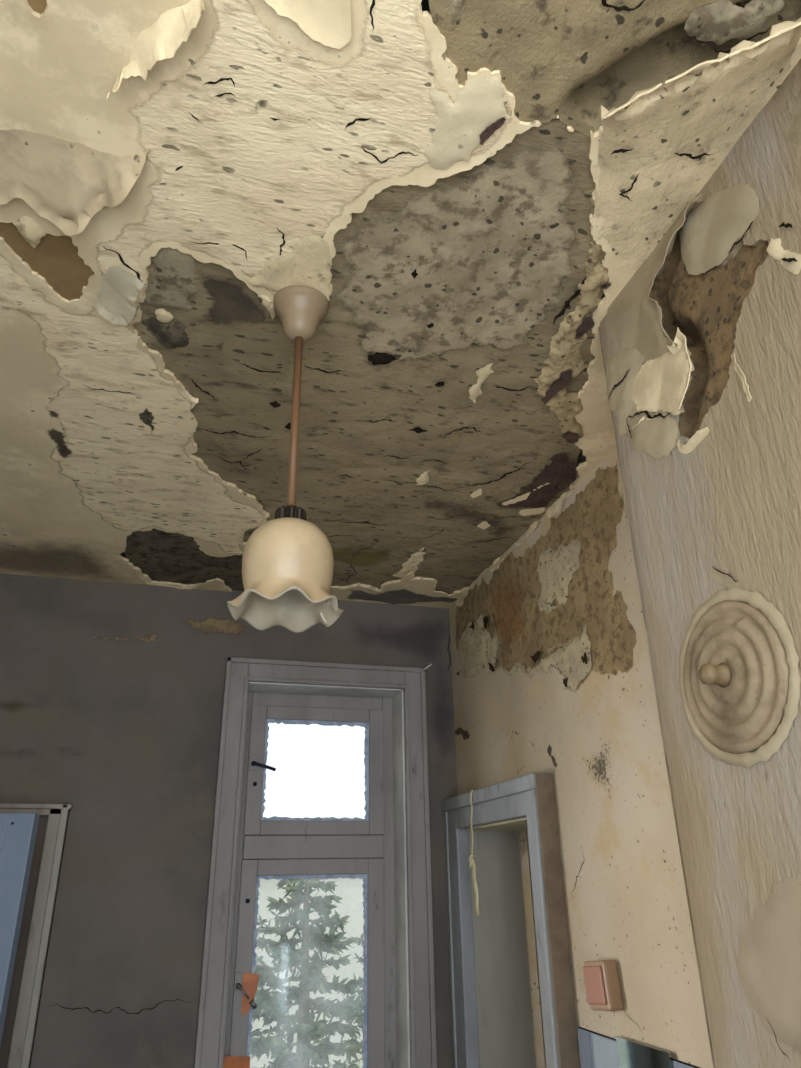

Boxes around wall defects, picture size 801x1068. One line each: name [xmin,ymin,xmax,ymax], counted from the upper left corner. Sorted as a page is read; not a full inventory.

spalling [0,0,801,693]
damp [0,549,100,574]
crack [45,999,186,1014]